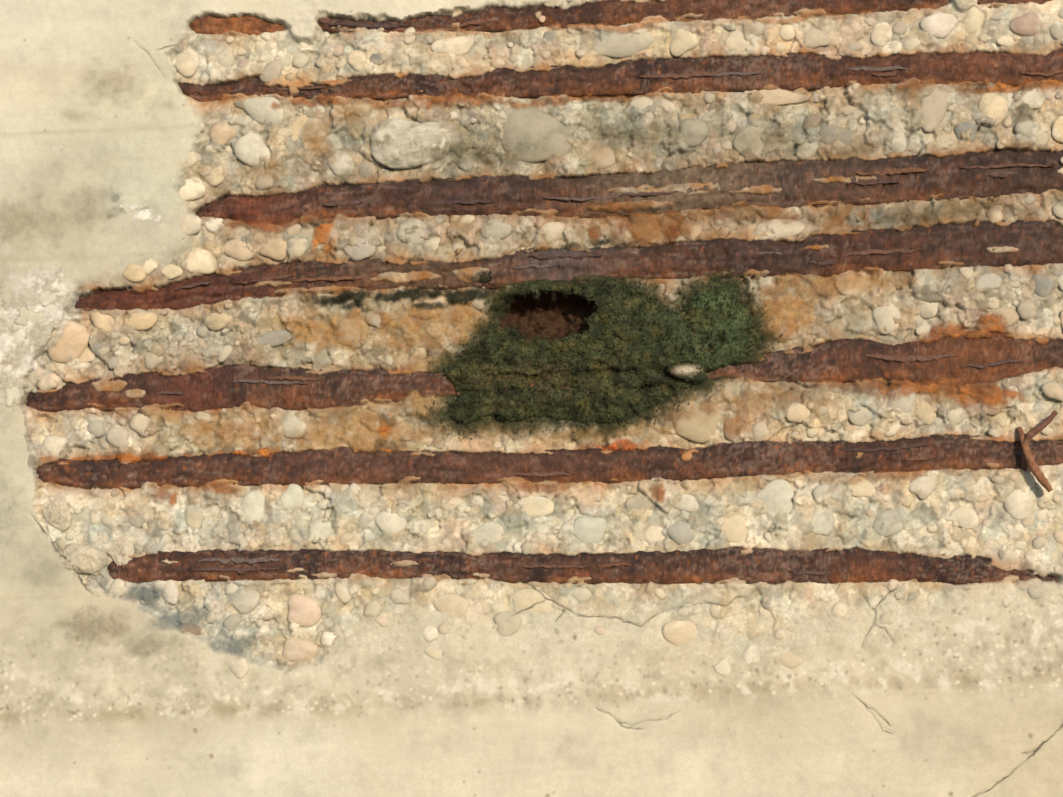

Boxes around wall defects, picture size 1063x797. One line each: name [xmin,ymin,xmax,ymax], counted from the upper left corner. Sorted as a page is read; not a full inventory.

corrosion [549,19,662,32]
corrosion [966,80,1063,93]
corrosion [272,95,345,107]
spalling [0,0,1063,415]
damp [2,270,55,323]
corrosion [922,314,1005,344]
corrosion [834,378,1021,405]
corrosion [69,452,190,463]
spalling [18,220,1063,679]
corrosion [590,439,636,452]